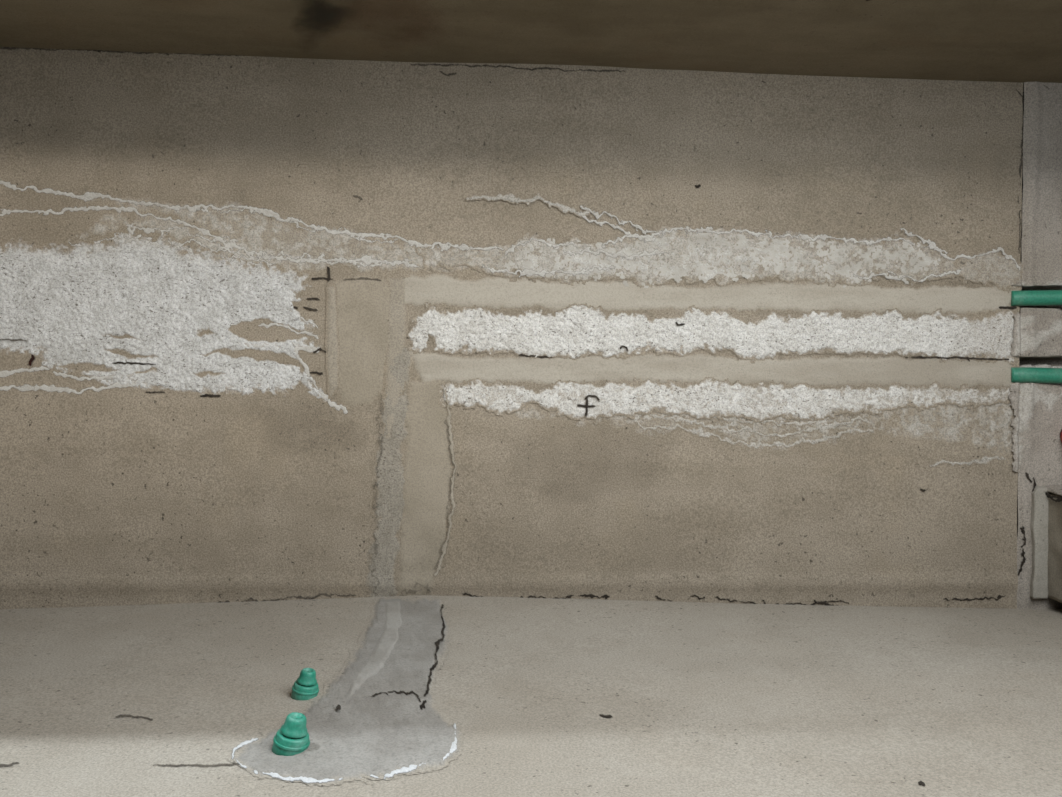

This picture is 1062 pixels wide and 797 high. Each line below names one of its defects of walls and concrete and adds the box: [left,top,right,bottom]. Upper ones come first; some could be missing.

damp [0,180,1062,414]
damp [436,377,1062,472]
crack [217,593,355,603]
crack [520,592,610,600]
crack [655,595,849,606]
crack [372,593,483,710]